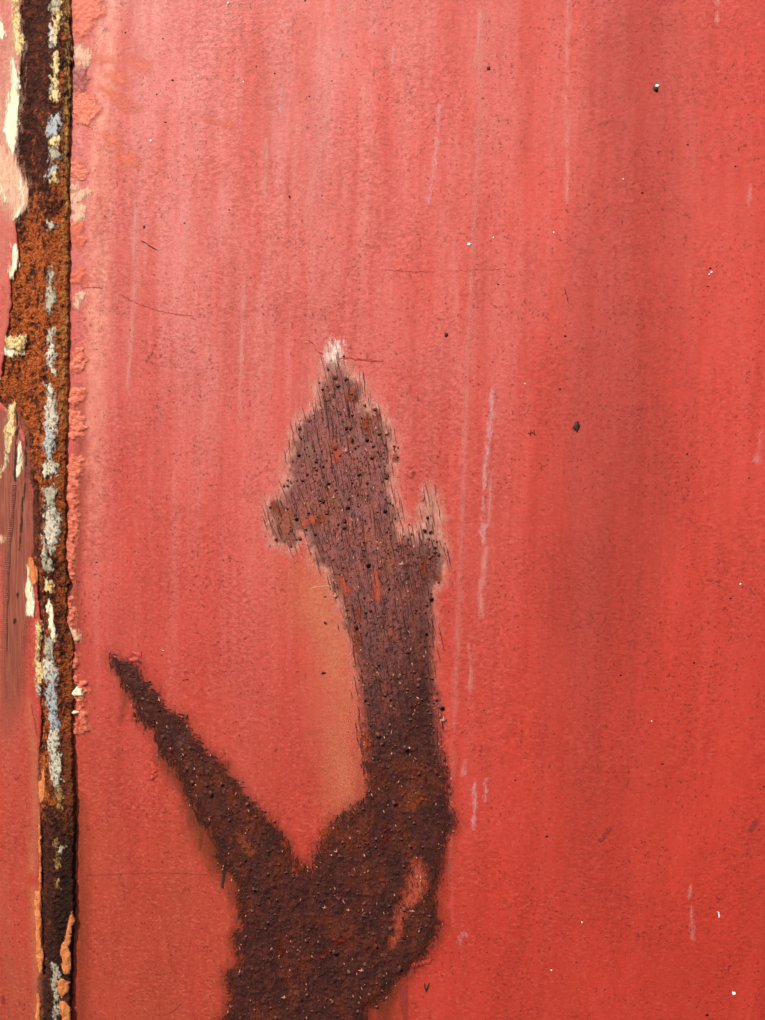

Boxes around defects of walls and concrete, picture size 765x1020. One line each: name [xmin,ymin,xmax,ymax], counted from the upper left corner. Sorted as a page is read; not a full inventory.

peeling [0,0,28,220]
peeling [7,244,20,278]
peeling [4,334,27,357]
peeling [0,401,23,478]
corrosion [109,339,460,1020]